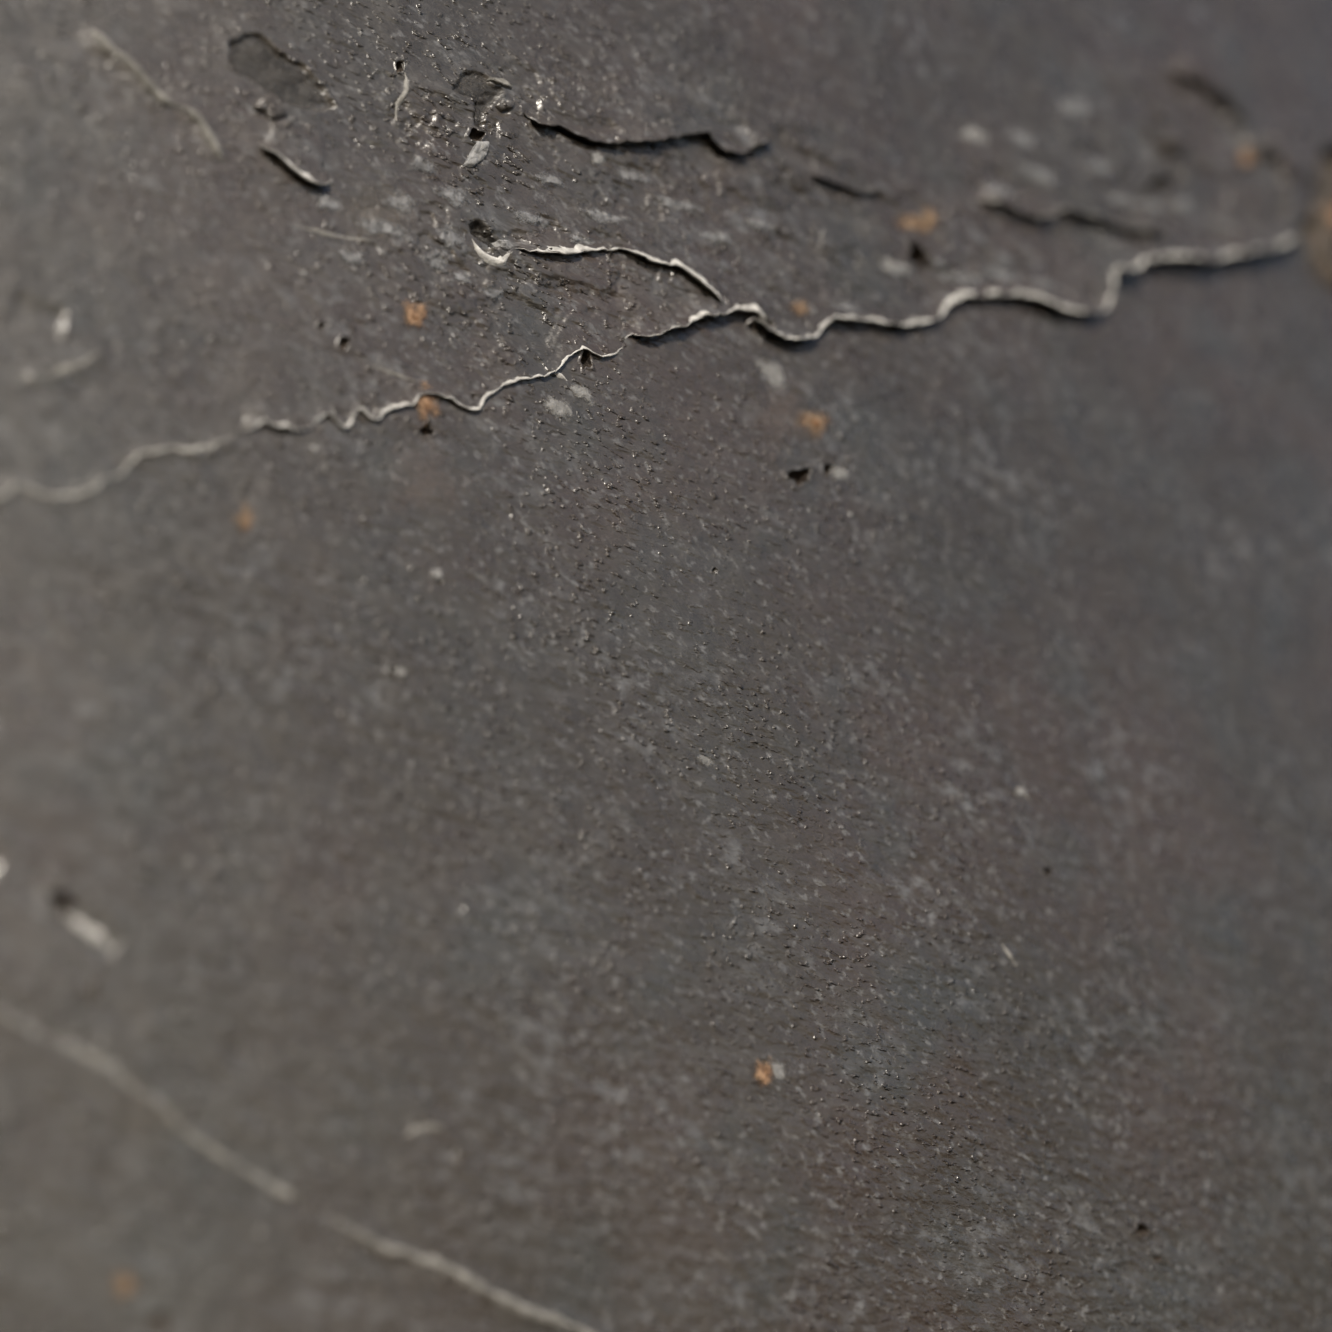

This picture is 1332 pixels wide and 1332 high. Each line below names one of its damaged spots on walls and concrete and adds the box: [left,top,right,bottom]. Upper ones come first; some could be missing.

spalling [232,41,323,121]
peeling [458,72,773,168]
peeling [259,140,332,186]
spalling [470,224,514,251]
peeling [972,184,1169,235]
crack [0,1009,299,1200]
crack [334,1219,593,1332]